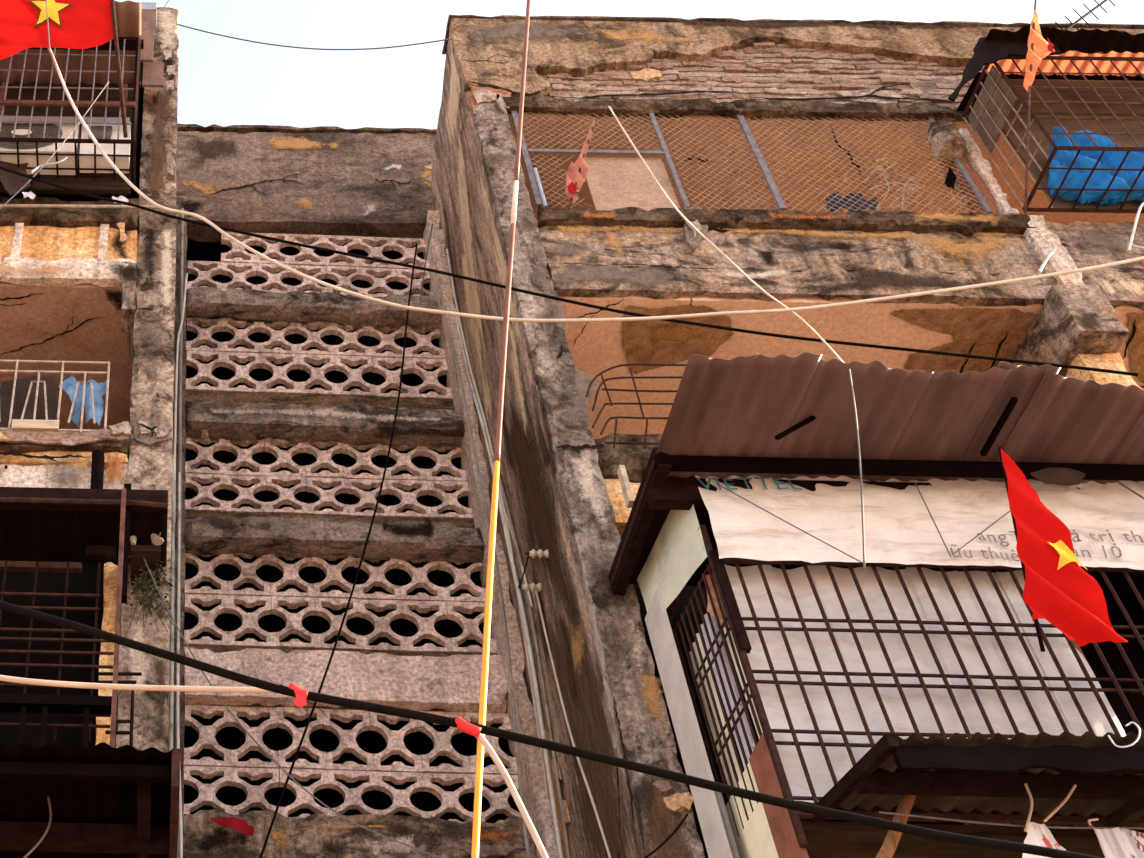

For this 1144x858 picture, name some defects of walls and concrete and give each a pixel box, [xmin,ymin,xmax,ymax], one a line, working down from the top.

spalling [446,41,985,428]
crack [0,293,43,306]
crack [1,316,106,355]